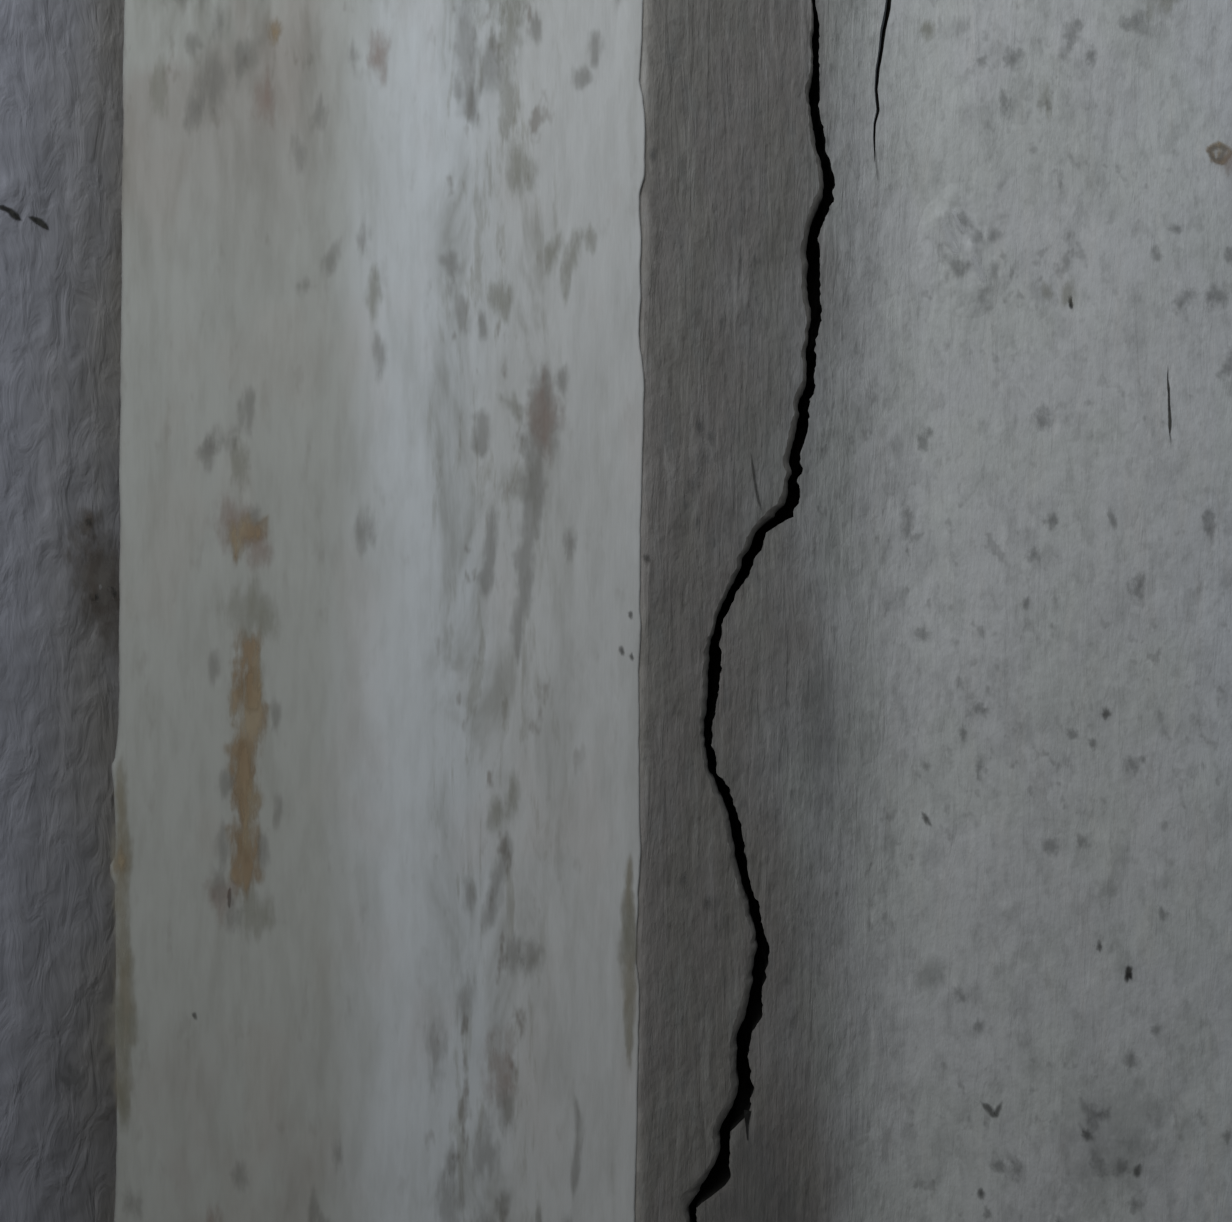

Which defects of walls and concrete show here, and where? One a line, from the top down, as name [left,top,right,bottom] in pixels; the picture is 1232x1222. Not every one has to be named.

crack [874,0,891,161]
crack [680,0,835,1222]
rust [230,637,266,894]